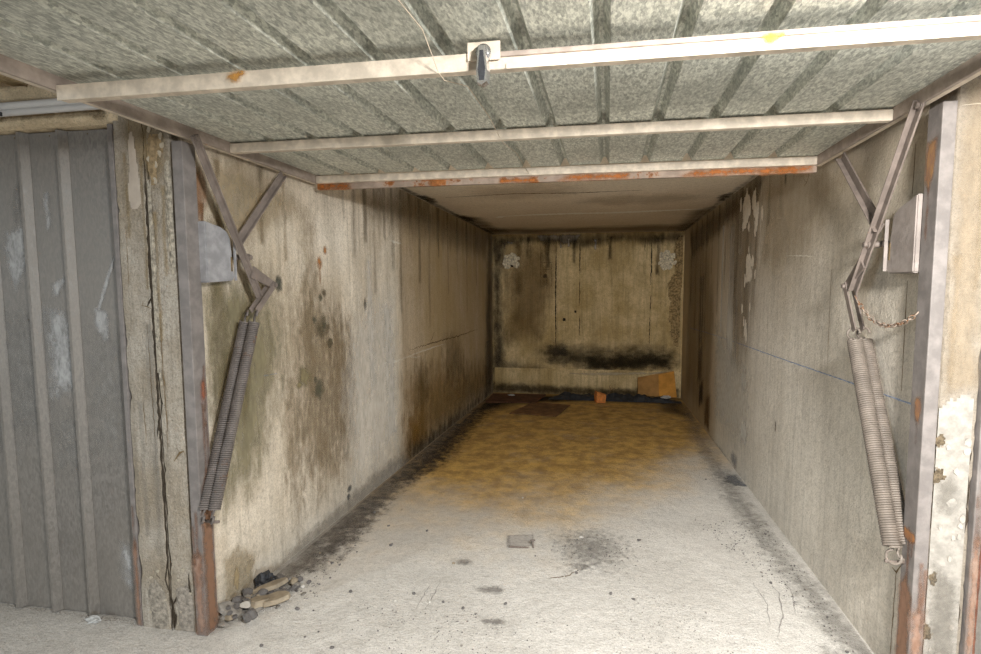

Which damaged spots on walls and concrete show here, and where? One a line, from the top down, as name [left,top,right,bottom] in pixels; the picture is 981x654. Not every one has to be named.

corrosion [763,33,785,43]
corrosion [566,172,629,180]
corrosion [684,166,811,176]
peeling [744,247,756,287]
peeling [740,188,764,237]
crack [126,119,191,630]
corrosion [201,368,209,486]
leakage [283,178,761,563]
corrosion [192,508,218,633]
corrosion [895,527,926,654]
corrosion [966,538,981,654]